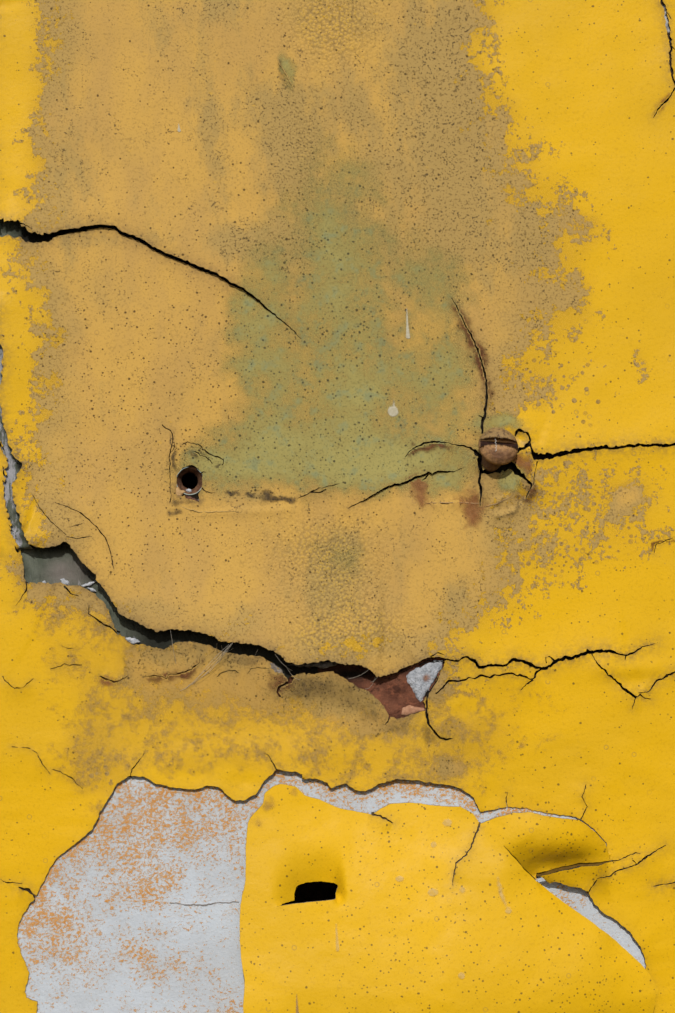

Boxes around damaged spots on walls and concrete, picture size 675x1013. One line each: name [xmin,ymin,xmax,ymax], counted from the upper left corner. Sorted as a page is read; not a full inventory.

crack [653,0,675,118]
crack [0,218,301,339]
crack [0,344,114,569]
crack [162,424,224,502]
crack [299,484,337,498]
crack [348,303,675,509]
crack [64,587,121,633]
crack [100,657,294,697]
crack [419,644,675,740]
peeling [17,769,606,1013]
peeling [535,866,646,968]
crack [587,845,665,892]